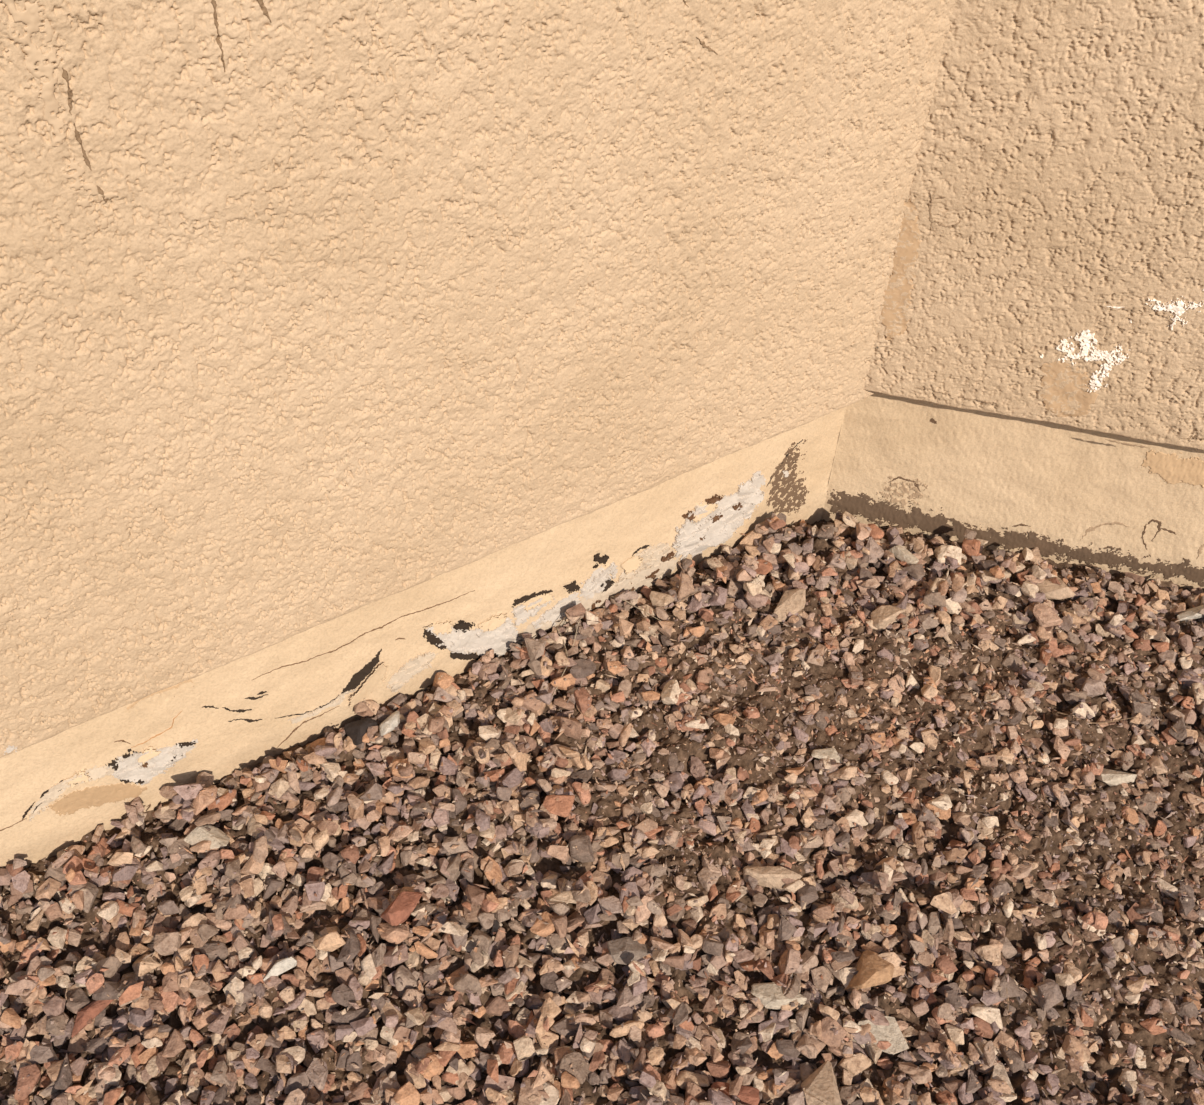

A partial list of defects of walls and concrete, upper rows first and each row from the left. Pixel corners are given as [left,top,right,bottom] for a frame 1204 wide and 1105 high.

peeling [682,494,743,523]
crack [115,590,475,748]
peeling [26,739,198,822]